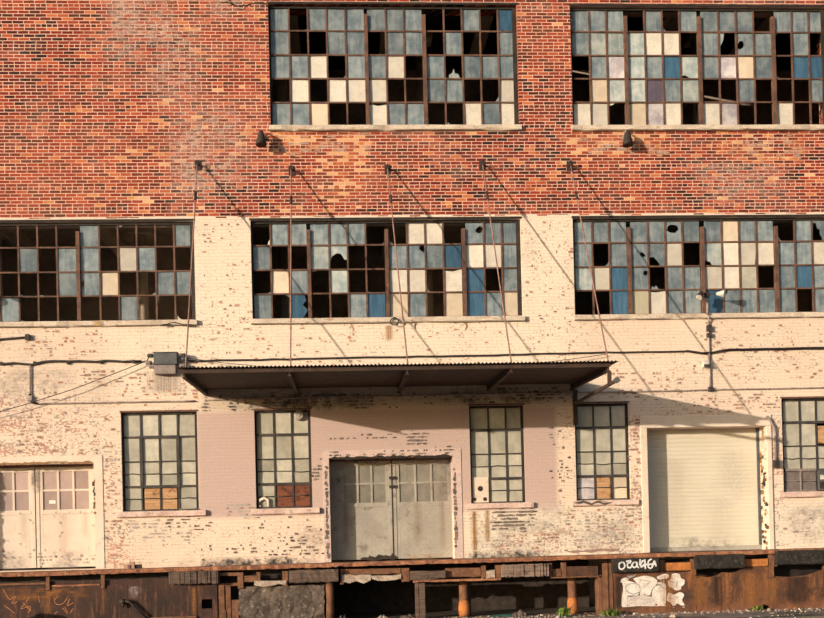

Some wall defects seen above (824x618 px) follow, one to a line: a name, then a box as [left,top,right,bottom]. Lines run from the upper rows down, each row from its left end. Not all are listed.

peeling [79,368,212,411]
peeling [605,369,683,401]
peeling [693,391,781,413]
peeling [9,409,66,453]
peeling [330,430,454,459]
peeling [92,442,213,556]
spalling [225,451,350,562]
peeling [490,416,643,555]
spalling [760,453,820,549]